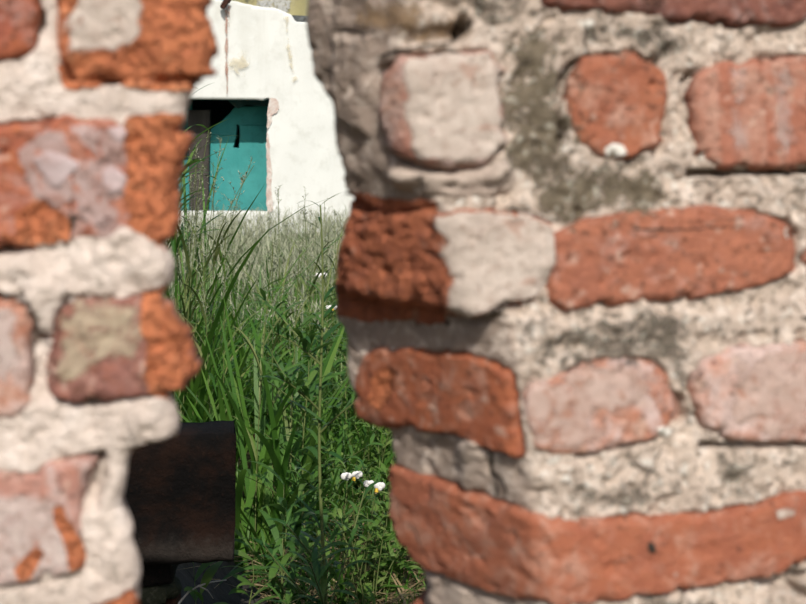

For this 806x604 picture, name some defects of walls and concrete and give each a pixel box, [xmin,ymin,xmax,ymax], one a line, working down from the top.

crack [483,445,507,497]